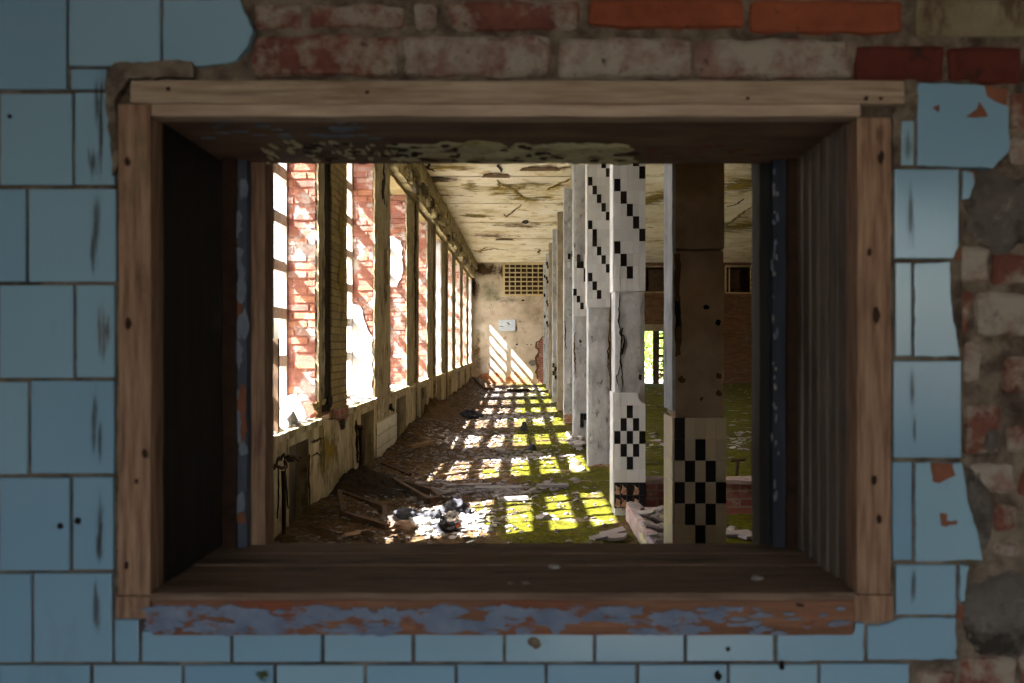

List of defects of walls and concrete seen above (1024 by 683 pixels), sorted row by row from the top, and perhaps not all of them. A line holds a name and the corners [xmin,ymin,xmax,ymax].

flaking render [252,0,1024,165]
peeling [201,121,640,277]
leakage [476,224,540,238]
flaking render [953,244,1024,382]
flaking render [999,356,1024,394]
flaking render [962,404,1024,557]
peeling [139,604,851,637]
flaking render [917,652,1024,683]